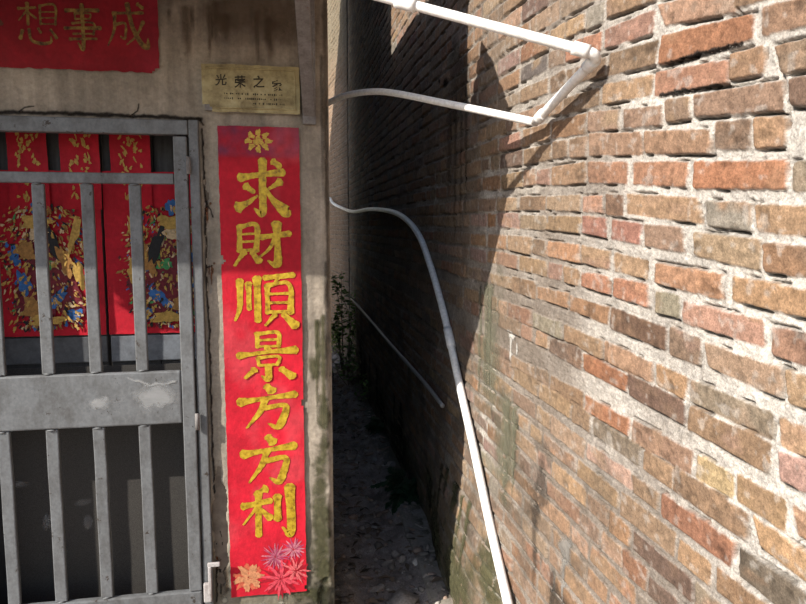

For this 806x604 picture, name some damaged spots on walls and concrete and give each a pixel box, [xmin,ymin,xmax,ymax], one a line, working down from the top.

damp [314,315,325,404]